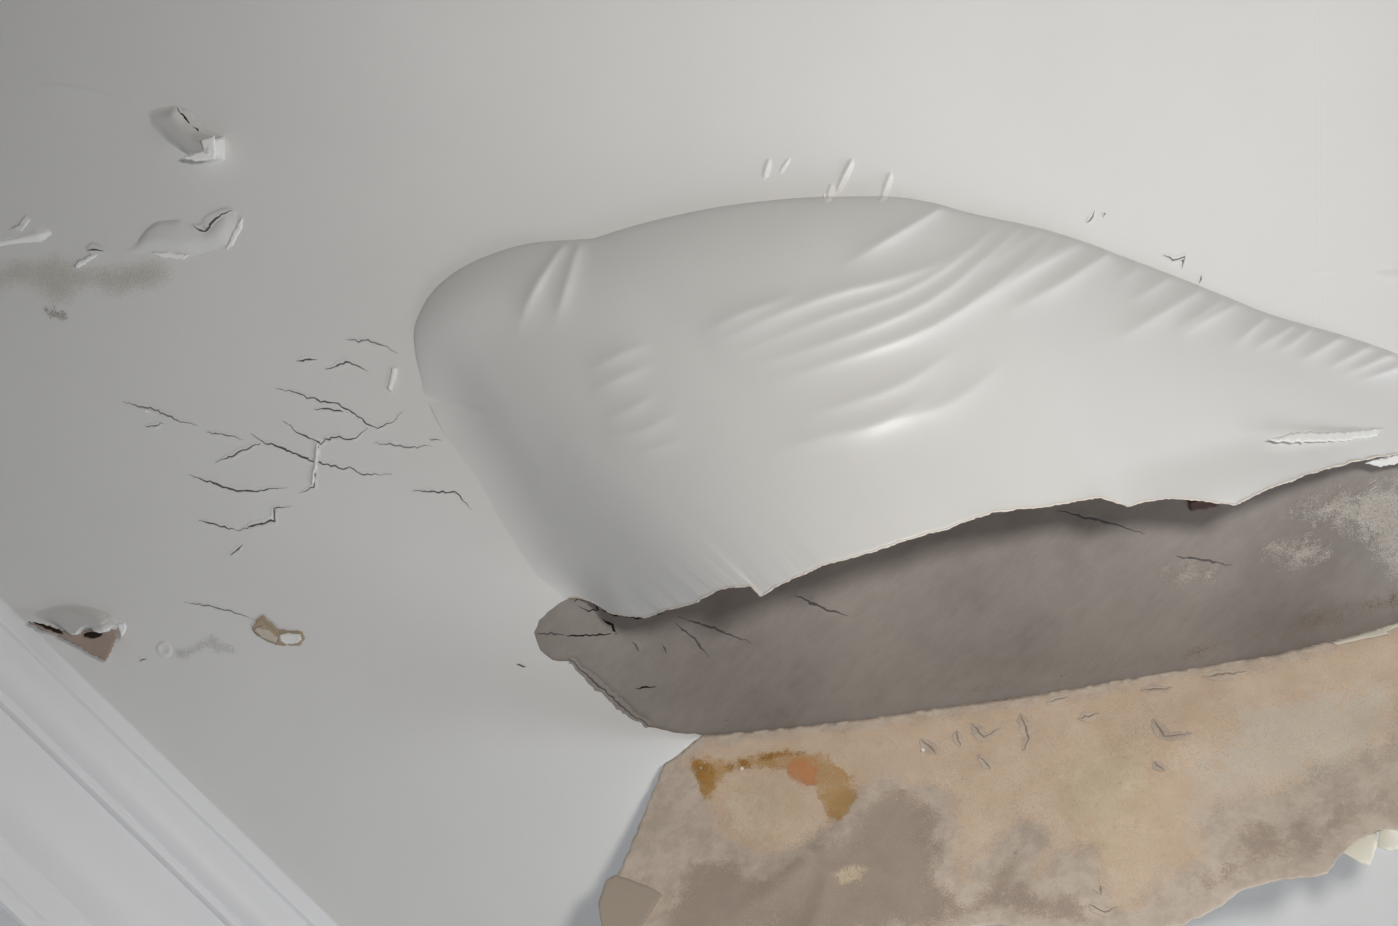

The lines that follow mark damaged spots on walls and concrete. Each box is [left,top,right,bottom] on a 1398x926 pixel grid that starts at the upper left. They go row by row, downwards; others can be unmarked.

peeling [74,209,243,268]
crack [122,335,472,556]
peeling [252,615,305,646]
flaking render [535,457,1398,926]
damp [663,775,1094,926]